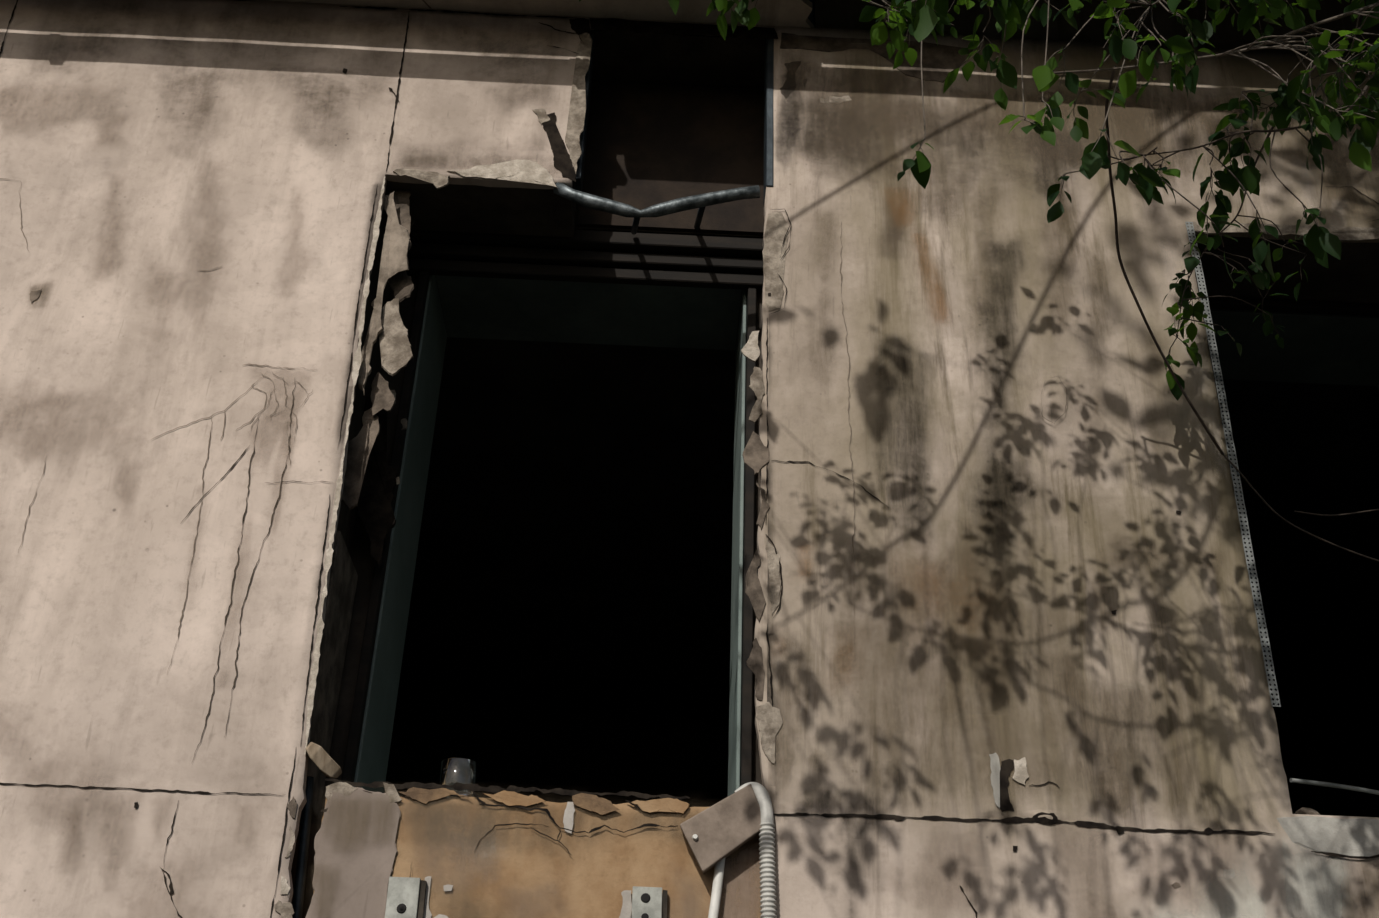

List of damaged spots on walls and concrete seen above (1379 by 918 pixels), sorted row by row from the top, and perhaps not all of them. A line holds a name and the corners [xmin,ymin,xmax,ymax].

spalling [565,33,592,174]
damp [1114,91,1168,176]
crack [337,0,583,450]
flaking render [342,159,557,567]
damp [986,245,1015,417]
damp [895,353,927,533]
crack [0,373,690,918]
damp [913,635,962,712]
flaking render [274,782,545,918]
spalling [563,793,689,834]
crack [960,885,978,918]
crack [773,781,1272,835]